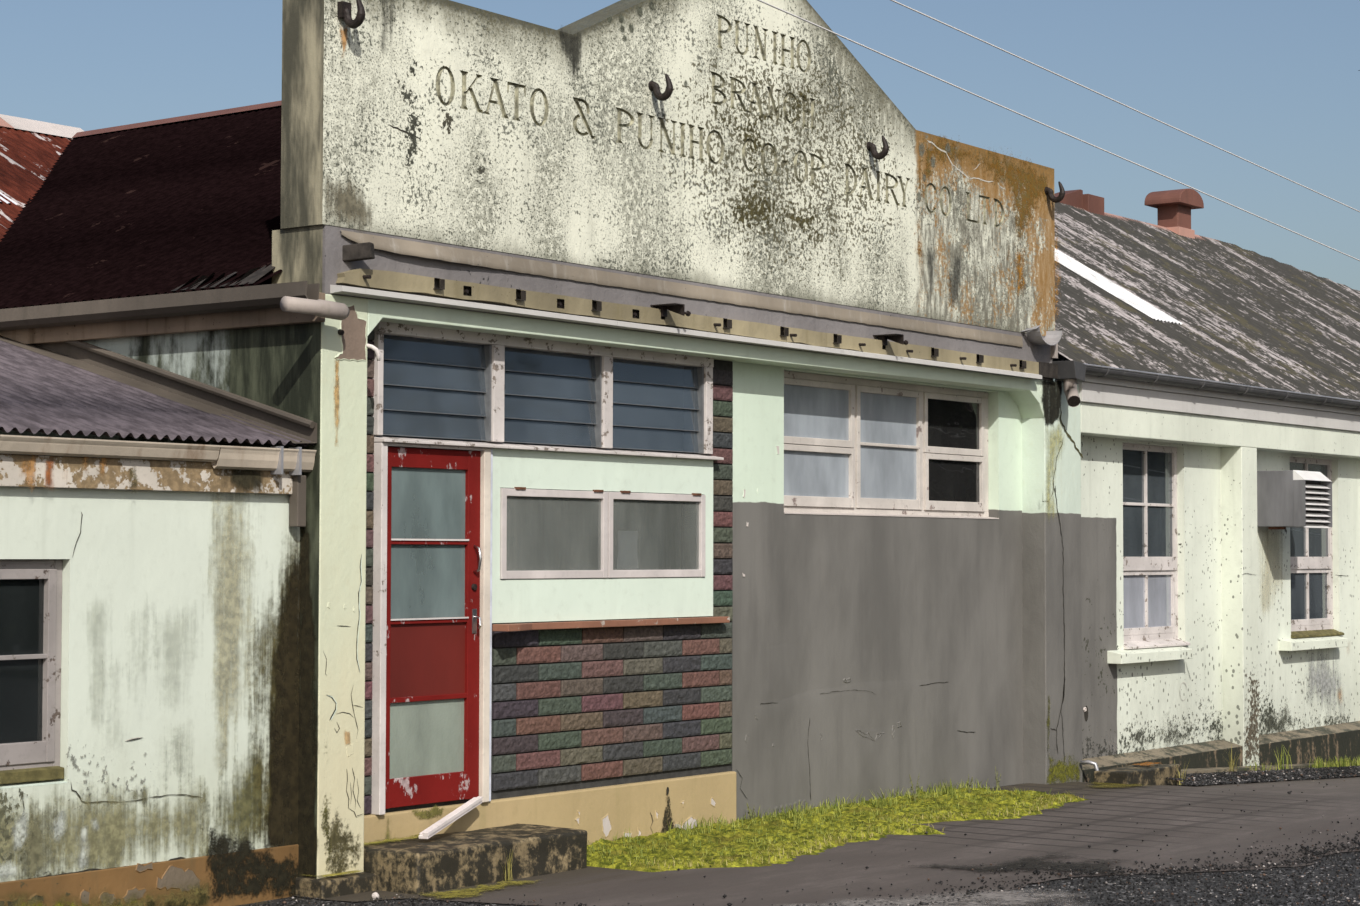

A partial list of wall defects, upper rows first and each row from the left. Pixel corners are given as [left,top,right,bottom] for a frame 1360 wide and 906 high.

leakage [394,59,459,175]
leakage [950,259,960,301]
leakage [148,505,318,906]
leakage [1082,690,1223,759]
leakage [1244,660,1351,766]
leakage [67,747,146,809]
peeling [601,813,642,838]
peeling [673,800,698,830]